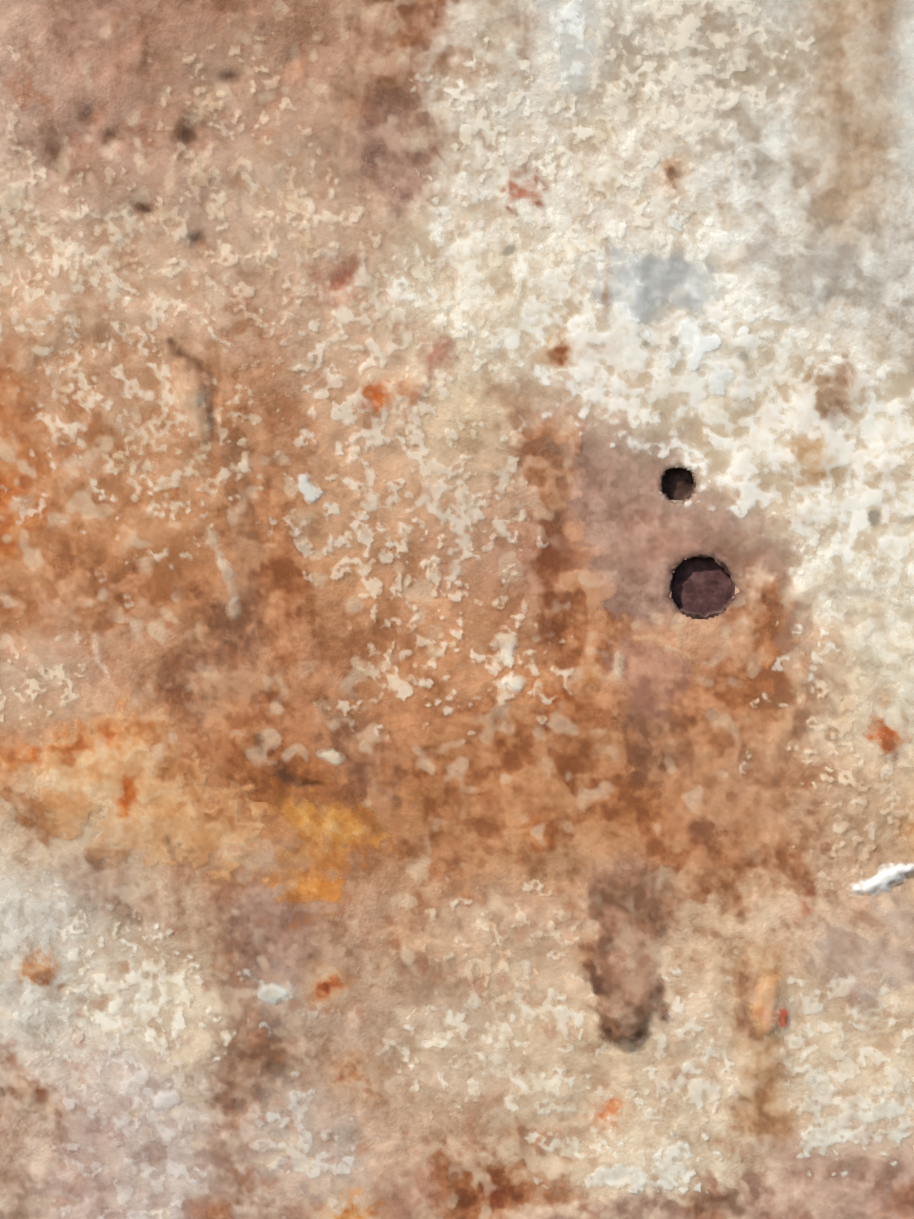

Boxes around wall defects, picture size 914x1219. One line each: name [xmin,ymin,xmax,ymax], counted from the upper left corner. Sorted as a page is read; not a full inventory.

leakage [811,0,901,230]
corrosion [0,409,71,506]
corrosion [32,479,183,609]
peeling [299,475,318,501]
corrosion [366,385,419,409]
corrosion [519,404,623,673]
corrosion [815,375,848,413]
corrosion [714,559,825,739]
corrosion [167,405,393,1219]
corrosion [545,691,807,898]
corrosion [869,726,897,751]
corrosion [616,1179,773,1219]